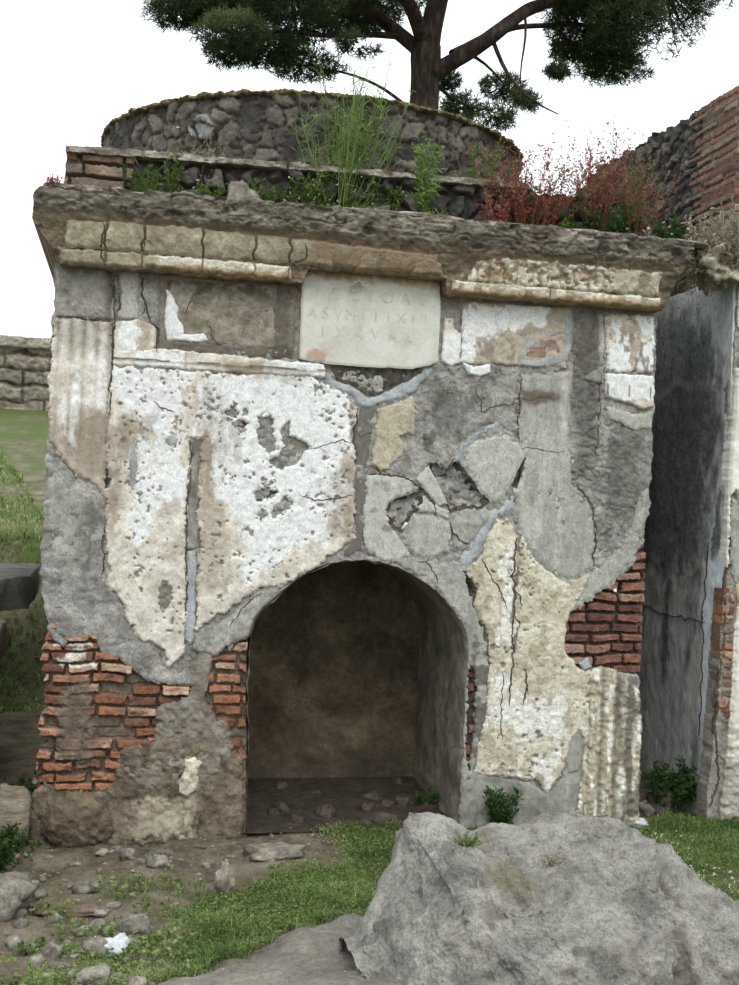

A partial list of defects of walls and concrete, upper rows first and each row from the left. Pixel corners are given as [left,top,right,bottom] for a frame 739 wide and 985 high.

flaking render [35,623,190,791]
flaking render [205,637,248,755]
flaking render [224,406,309,469]
crack [300,494,352,502]
crack [311,408,529,739]
flaking render [427,459,489,513]
crack [475,375,564,453]
crack [572,479,598,567]
flaking render [565,545,646,674]
leakage [642,306,728,566]
crack [642,496,732,807]
flaking render [710,587,736,723]